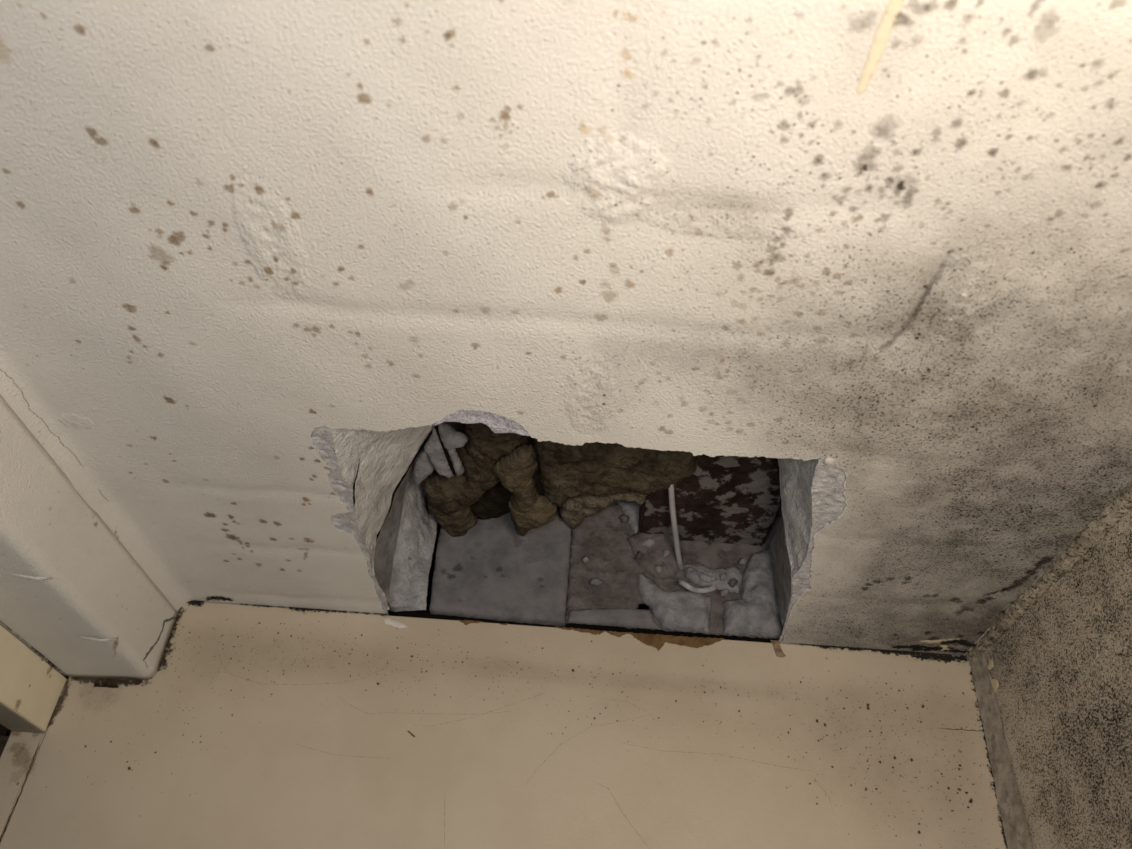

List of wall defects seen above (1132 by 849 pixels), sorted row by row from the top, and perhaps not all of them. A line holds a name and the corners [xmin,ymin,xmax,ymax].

damp [639,96,870,244]
crack [0,369,84,468]
spalling [312,410,536,616]
spalling [556,627,725,651]
damp [236,155,1132,849]
spalling [770,457,846,644]